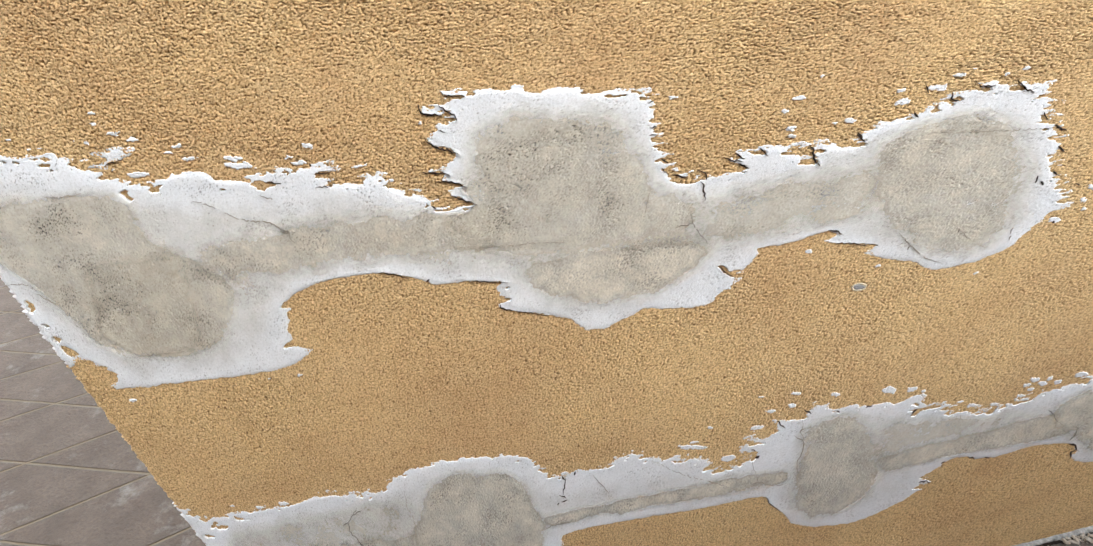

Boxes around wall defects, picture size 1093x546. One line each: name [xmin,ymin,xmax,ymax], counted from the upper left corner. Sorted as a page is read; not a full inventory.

peeling [0,66,1093,402]
crack [676,181,707,242]
peeling [172,372,1093,546]